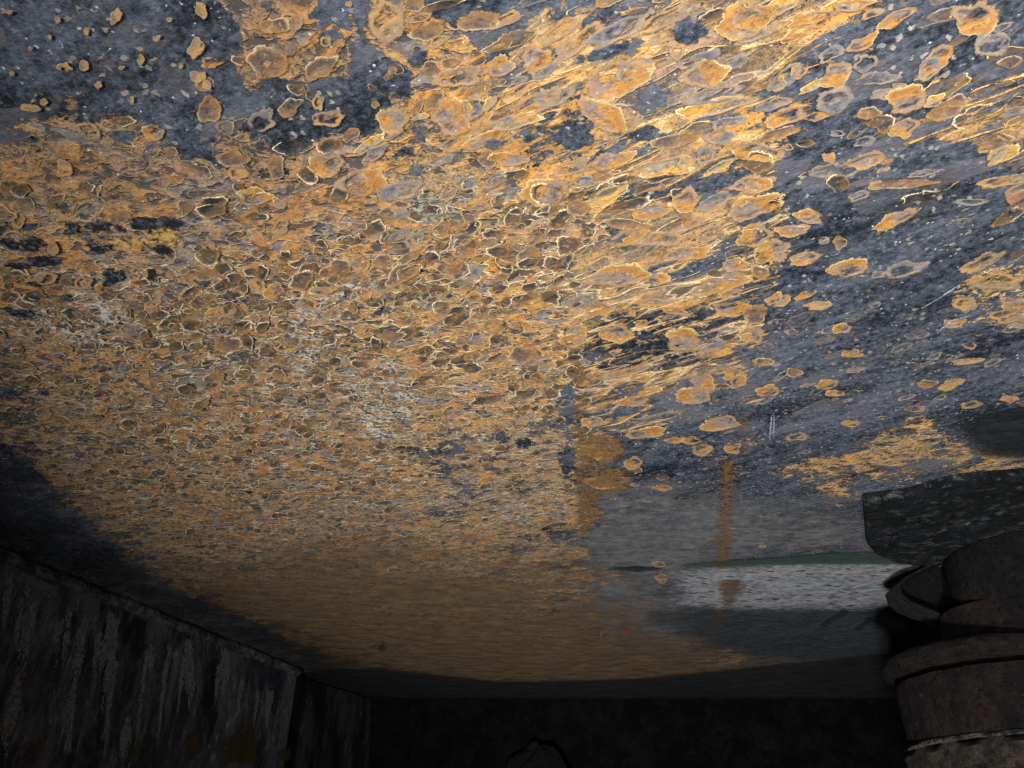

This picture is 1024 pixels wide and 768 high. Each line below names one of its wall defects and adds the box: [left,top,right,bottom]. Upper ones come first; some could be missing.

rust [949,0,1024,69]
rust [853,44,1024,167]
peeling [871,181,959,231]
rust [976,163,1024,211]
peeling [990,206,1024,228]
rust [943,251,1024,329]
rust [0,0,917,682]
peeling [886,332,958,367]
peeling [973,320,1023,380]
peeling [713,357,794,406]
peeling [914,395,983,420]
rust [774,406,1024,507]